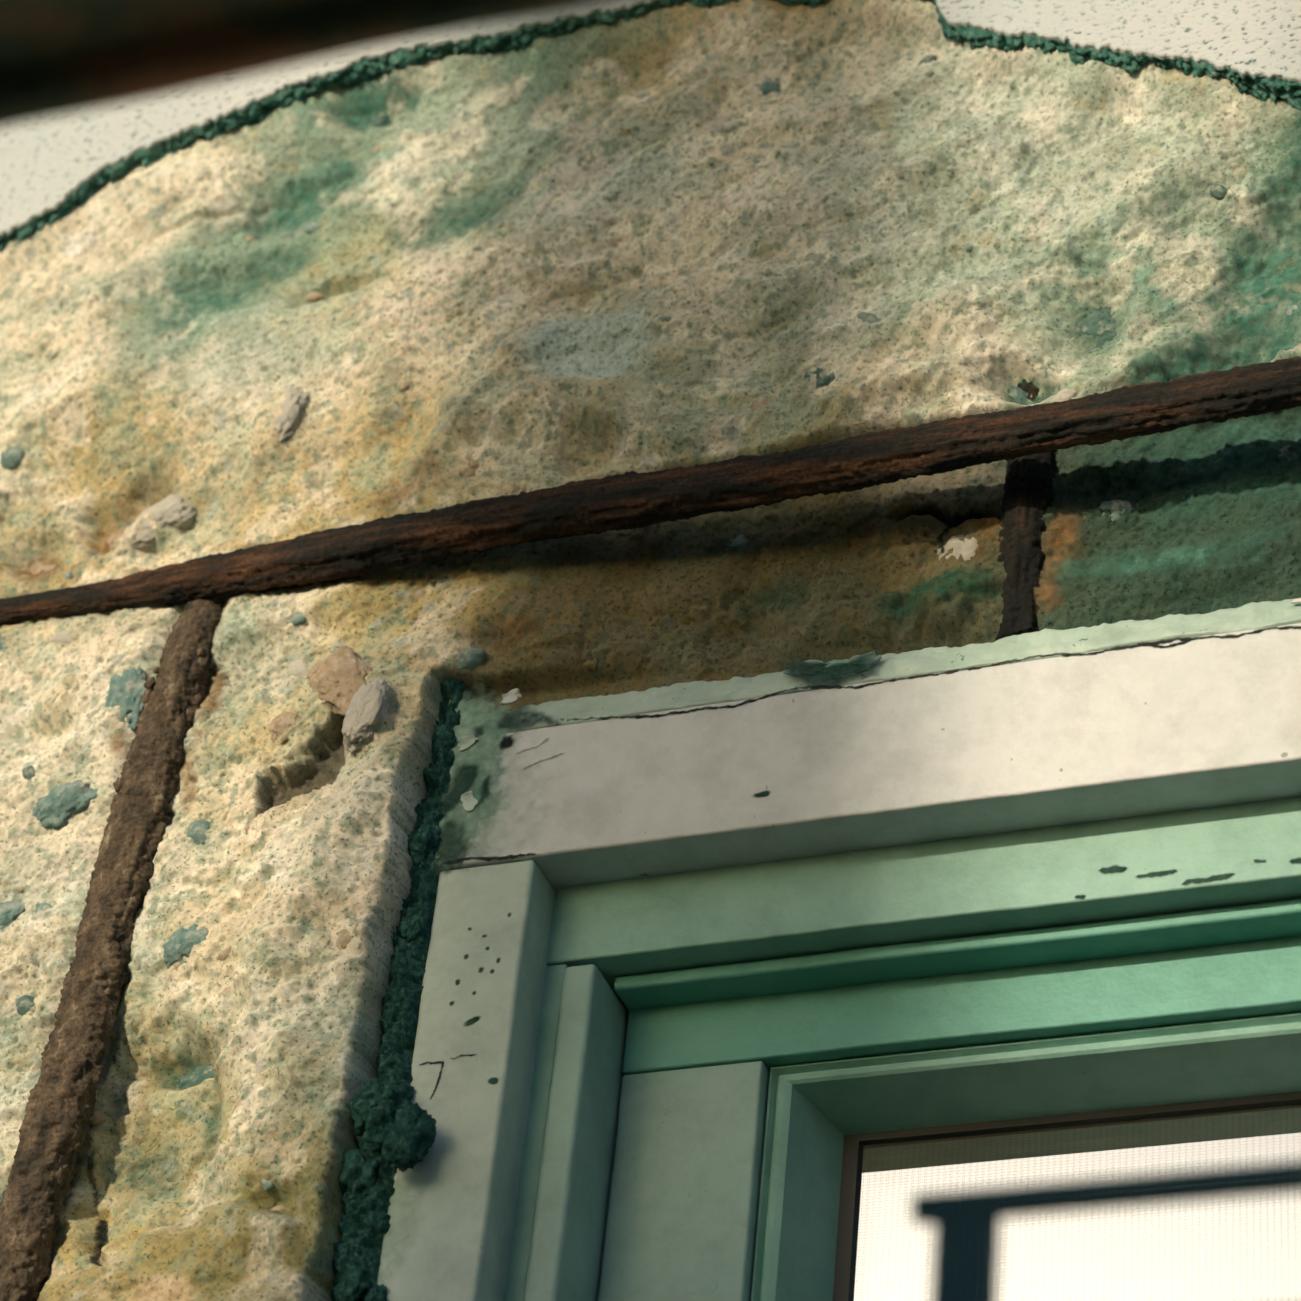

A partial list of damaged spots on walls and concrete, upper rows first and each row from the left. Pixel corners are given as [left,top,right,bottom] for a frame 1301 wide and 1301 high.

spalling [0,0,1301,598]
spalling [0,604,187,1206]
rust [0,356,1301,1301]
spalling [39,406,1301,1301]